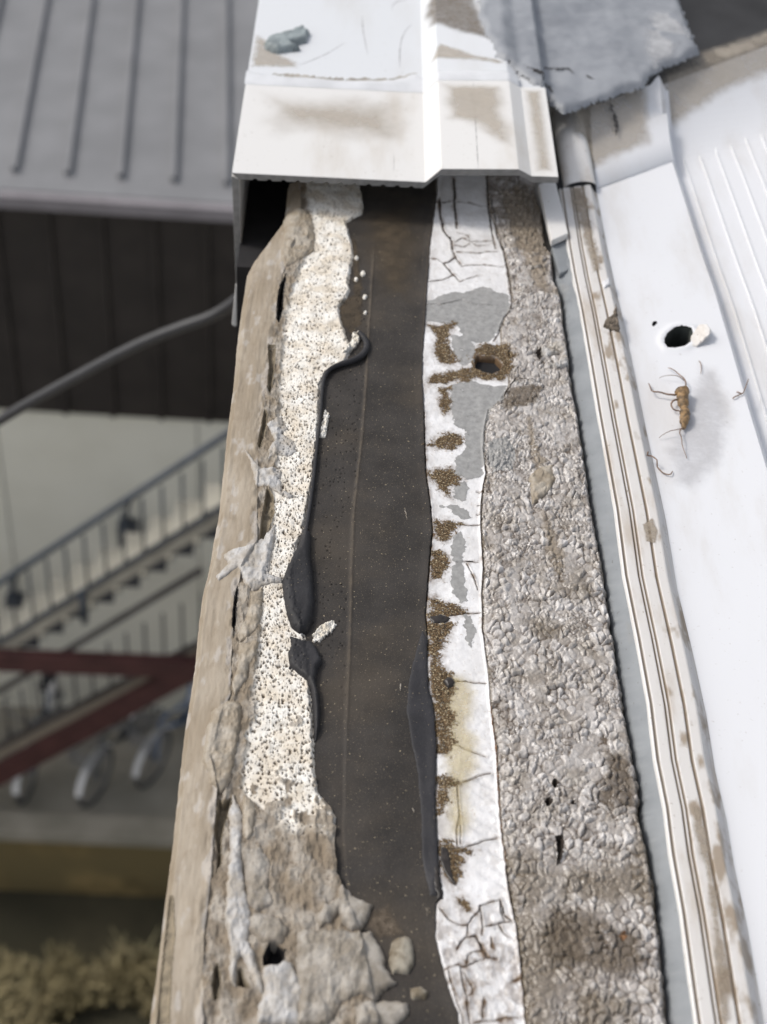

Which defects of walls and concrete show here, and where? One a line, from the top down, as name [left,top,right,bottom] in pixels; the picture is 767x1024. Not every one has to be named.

damp [453,87,501,133]
crack [426,178,513,338]
peeling [439,380,516,648]
crack [440,870,527,1024]